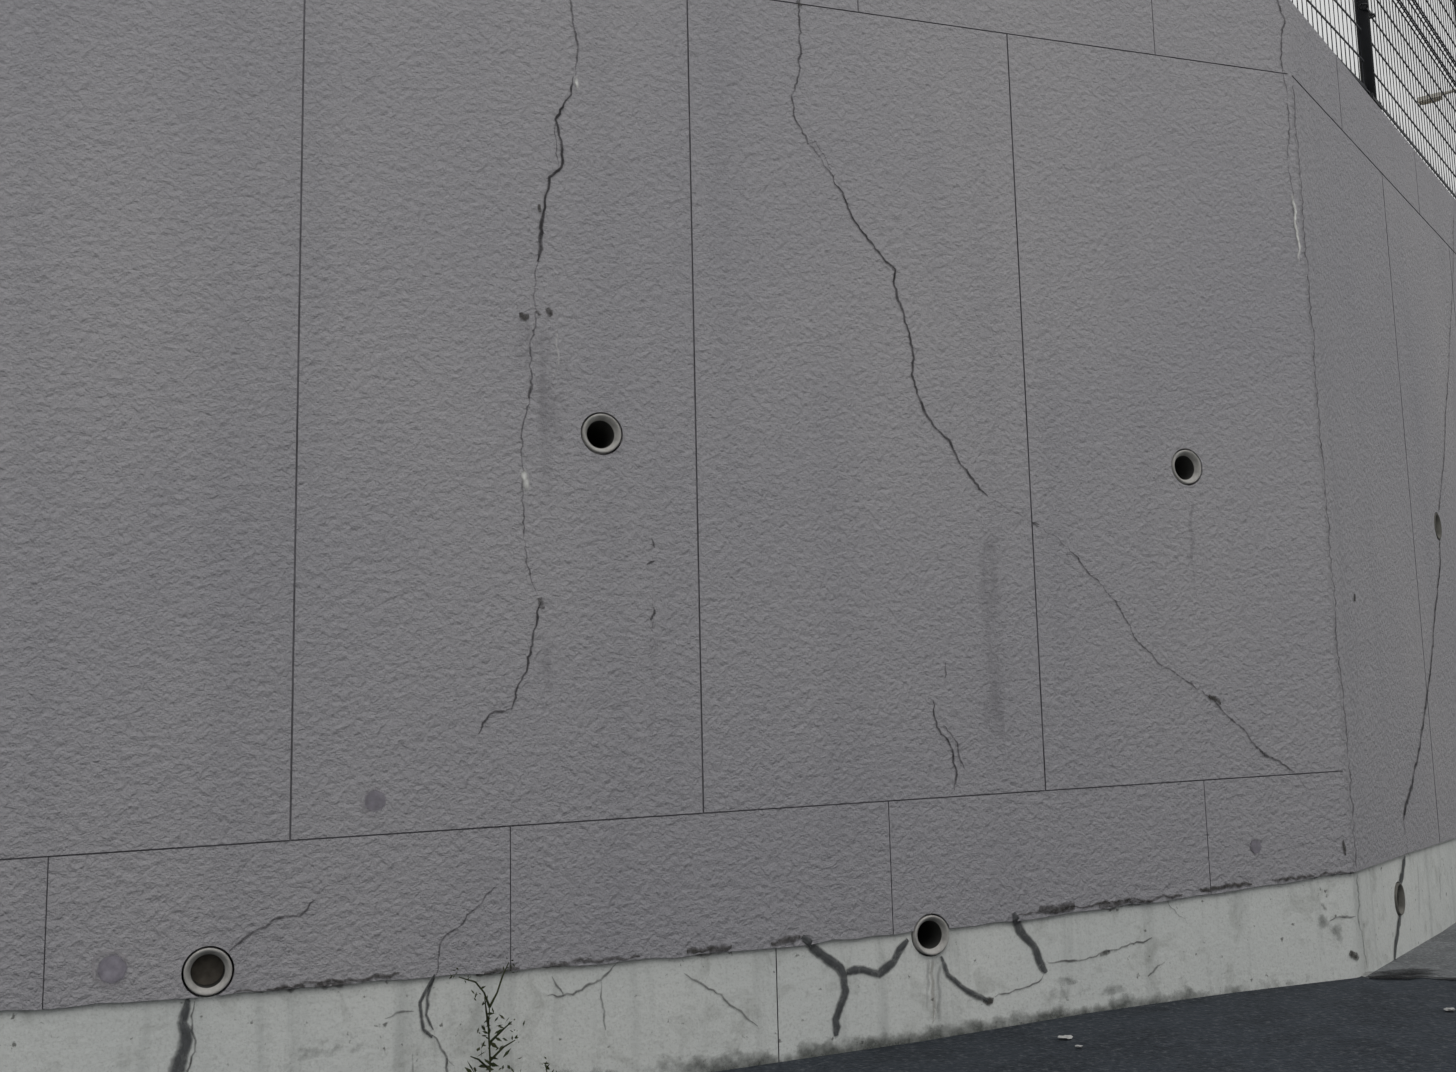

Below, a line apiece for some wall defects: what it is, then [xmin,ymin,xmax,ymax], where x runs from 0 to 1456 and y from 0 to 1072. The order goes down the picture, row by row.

crack [535,9,578,272]
crack [791,0,816,142]
crack [519,307,553,524]
crack [832,175,987,495]
crack [1277,0,1406,960]
crack [479,569,543,733]
crack [933,676,963,781]
crack [1069,549,1289,769]
crack [1404,372,1449,817]
crack [229,901,313,952]
crack [401,889,493,1072]
crack [940,956,994,1005]